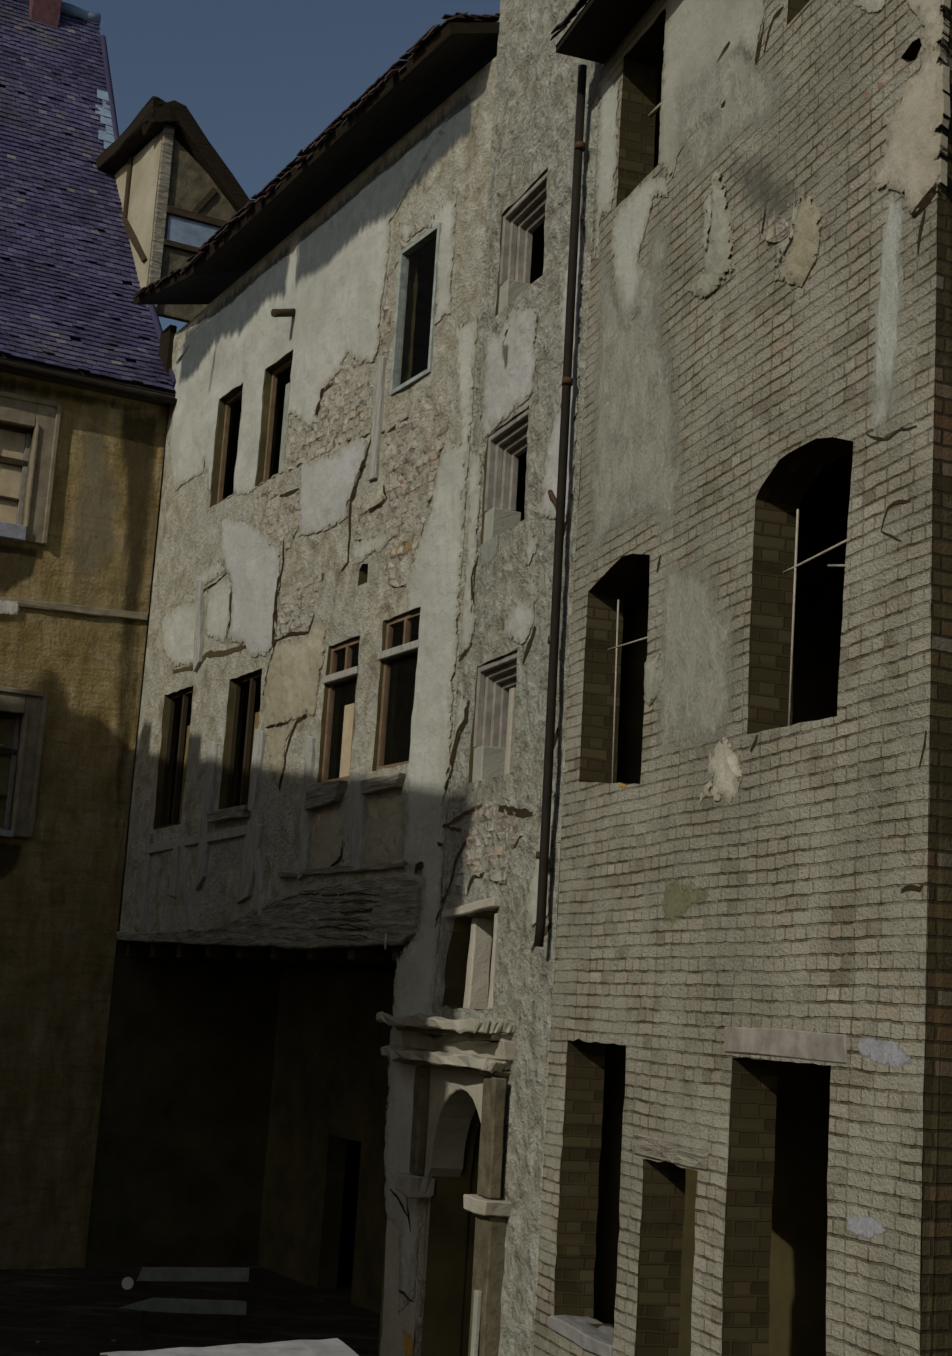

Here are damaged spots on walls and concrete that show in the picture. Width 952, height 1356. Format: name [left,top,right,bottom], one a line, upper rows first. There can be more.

peeling [854,0,887,13]
peeling [871,0,951,214]
peeling [540,0,766,522]
spalling [763,203,790,243]
peeling [160,180,557,1314]